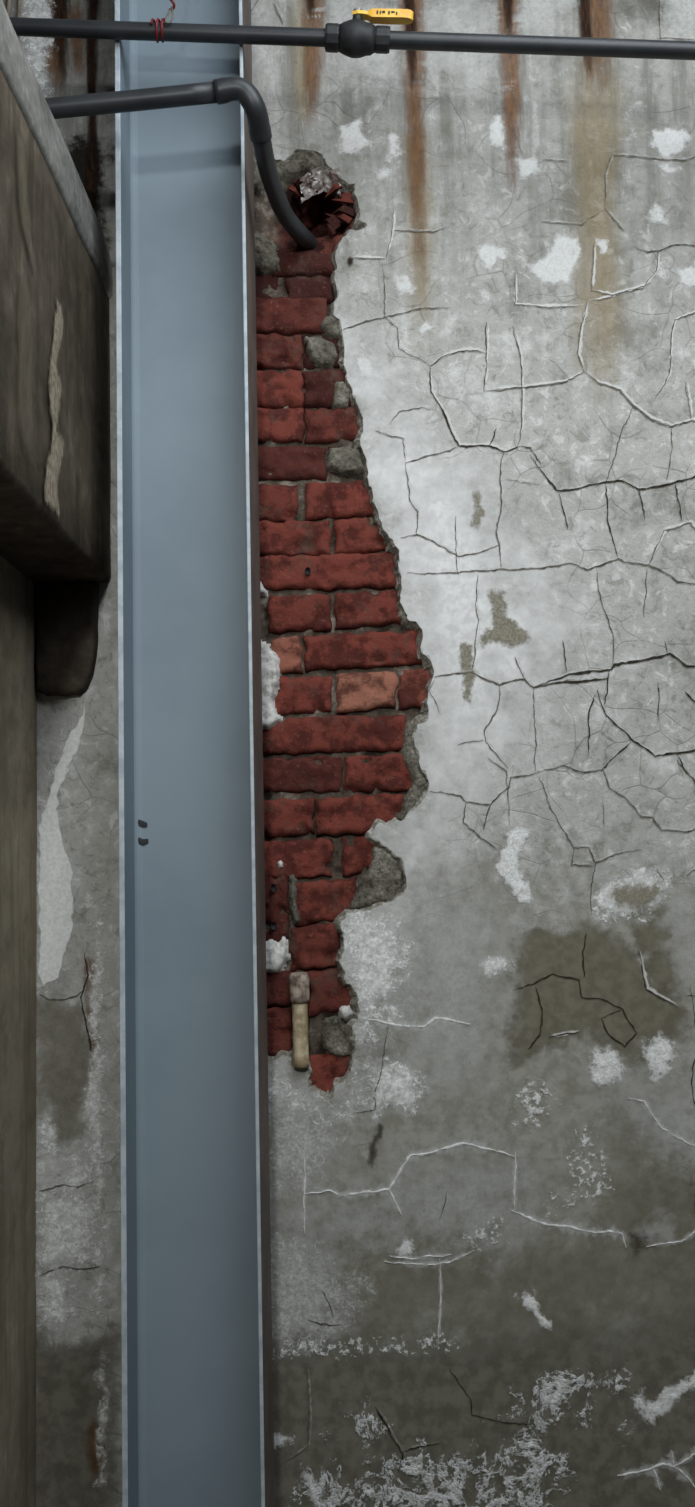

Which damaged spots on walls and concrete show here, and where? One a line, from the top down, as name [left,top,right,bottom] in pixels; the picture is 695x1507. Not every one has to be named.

corrosion [305,0,323,28]
corrosion [404,0,421,31]
corrosion [502,0,517,35]
corrosion [579,0,609,38]
corrosion [306,47,319,102]
corrosion [407,50,424,205]
corrosion [503,54,519,148]
spalling [253,120,434,1099]
crack [339,154,695,1049]
crack [356,1027,388,1113]
water stain [268,827,695,1507]
crack [309,1292,336,1326]